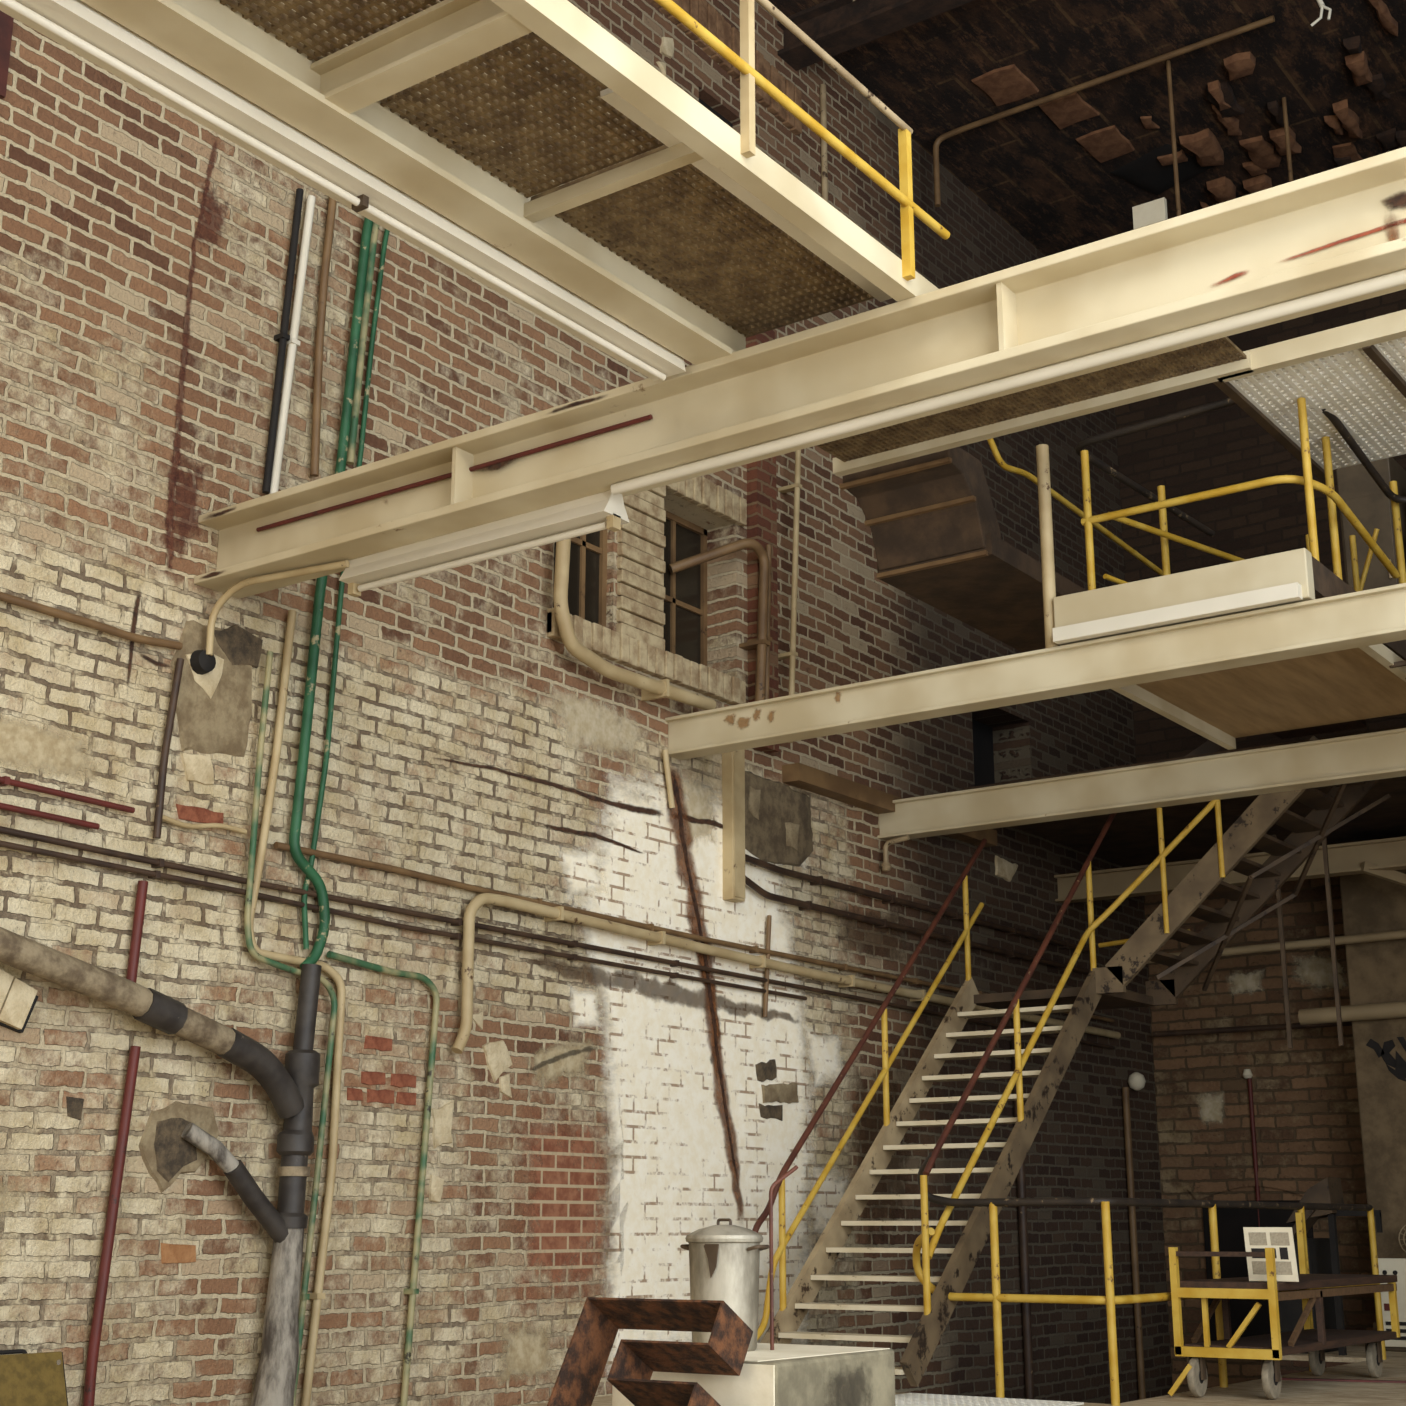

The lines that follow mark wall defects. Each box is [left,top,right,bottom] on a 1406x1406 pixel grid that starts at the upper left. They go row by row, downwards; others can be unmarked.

peeling [971,64,1135,163]
corrosion [1286,192,1406,260]
flaking render [170,620,263,785]
peeling [521,771,847,1342]
spalling [139,1101,219,1193]
peeling [609,1329,692,1366]